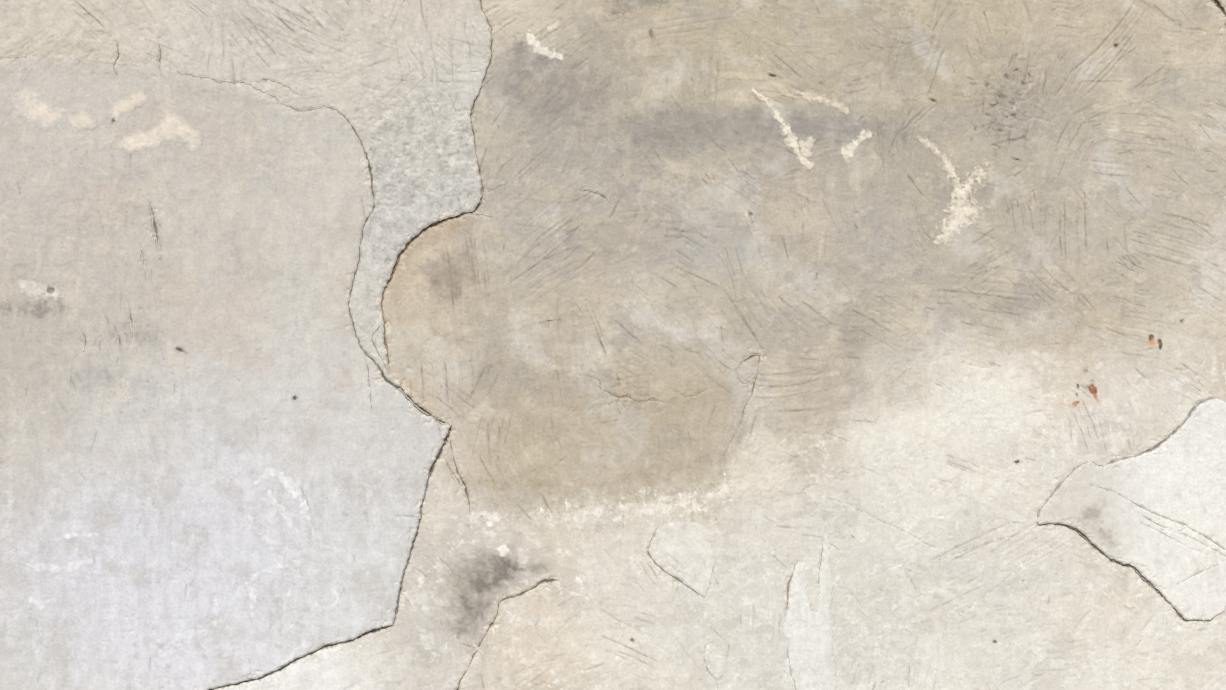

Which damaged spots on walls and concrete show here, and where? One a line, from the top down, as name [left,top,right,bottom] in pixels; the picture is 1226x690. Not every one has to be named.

crack [112,42,122,75]
crack [1210,0,1226,29]
flaking render [0,0,492,690]
crack [156,0,495,690]
damp [411,235,492,309]
crack [540,316,561,324]
damp [437,288,1155,588]
crack [454,577,559,690]
flaking render [649,522,714,597]
damp [841,534,990,690]